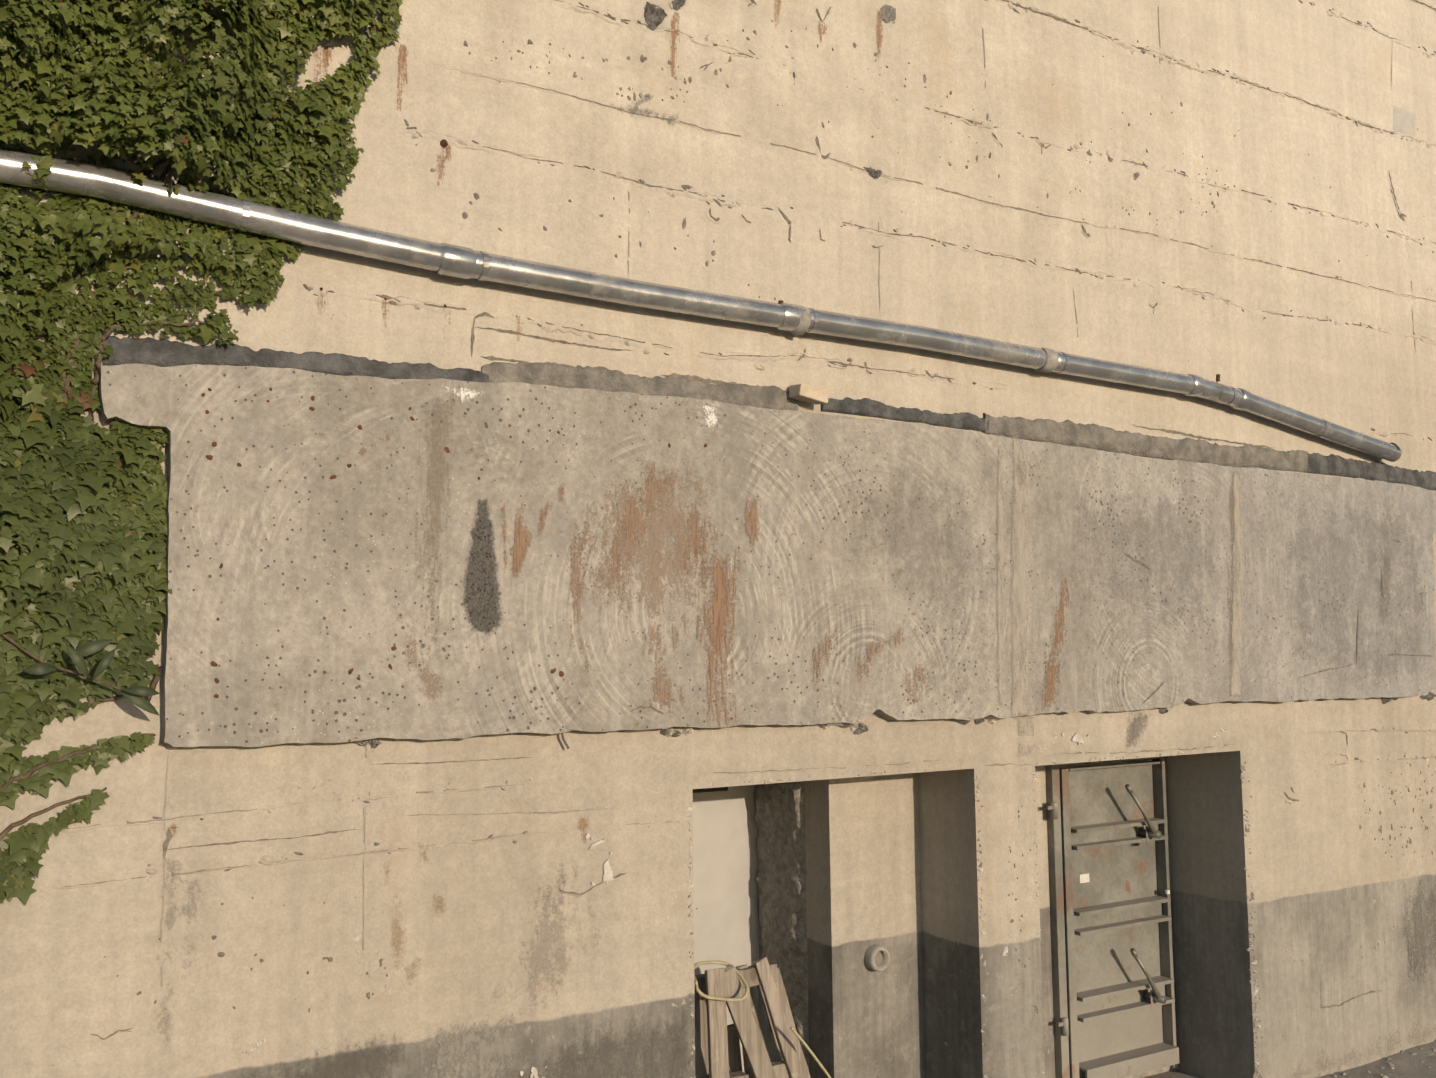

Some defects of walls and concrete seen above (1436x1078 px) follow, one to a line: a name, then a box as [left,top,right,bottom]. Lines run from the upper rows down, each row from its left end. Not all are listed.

spalling [644,0,686,31]
corrosion [671,15,679,78]
corrosion [744,500,760,545]
water stain [464,500,501,633]
corrosion [571,464,737,726]
corrosion [1042,576,1073,709]
peeling [585,833,614,885]
crack [1320,977,1383,1009]